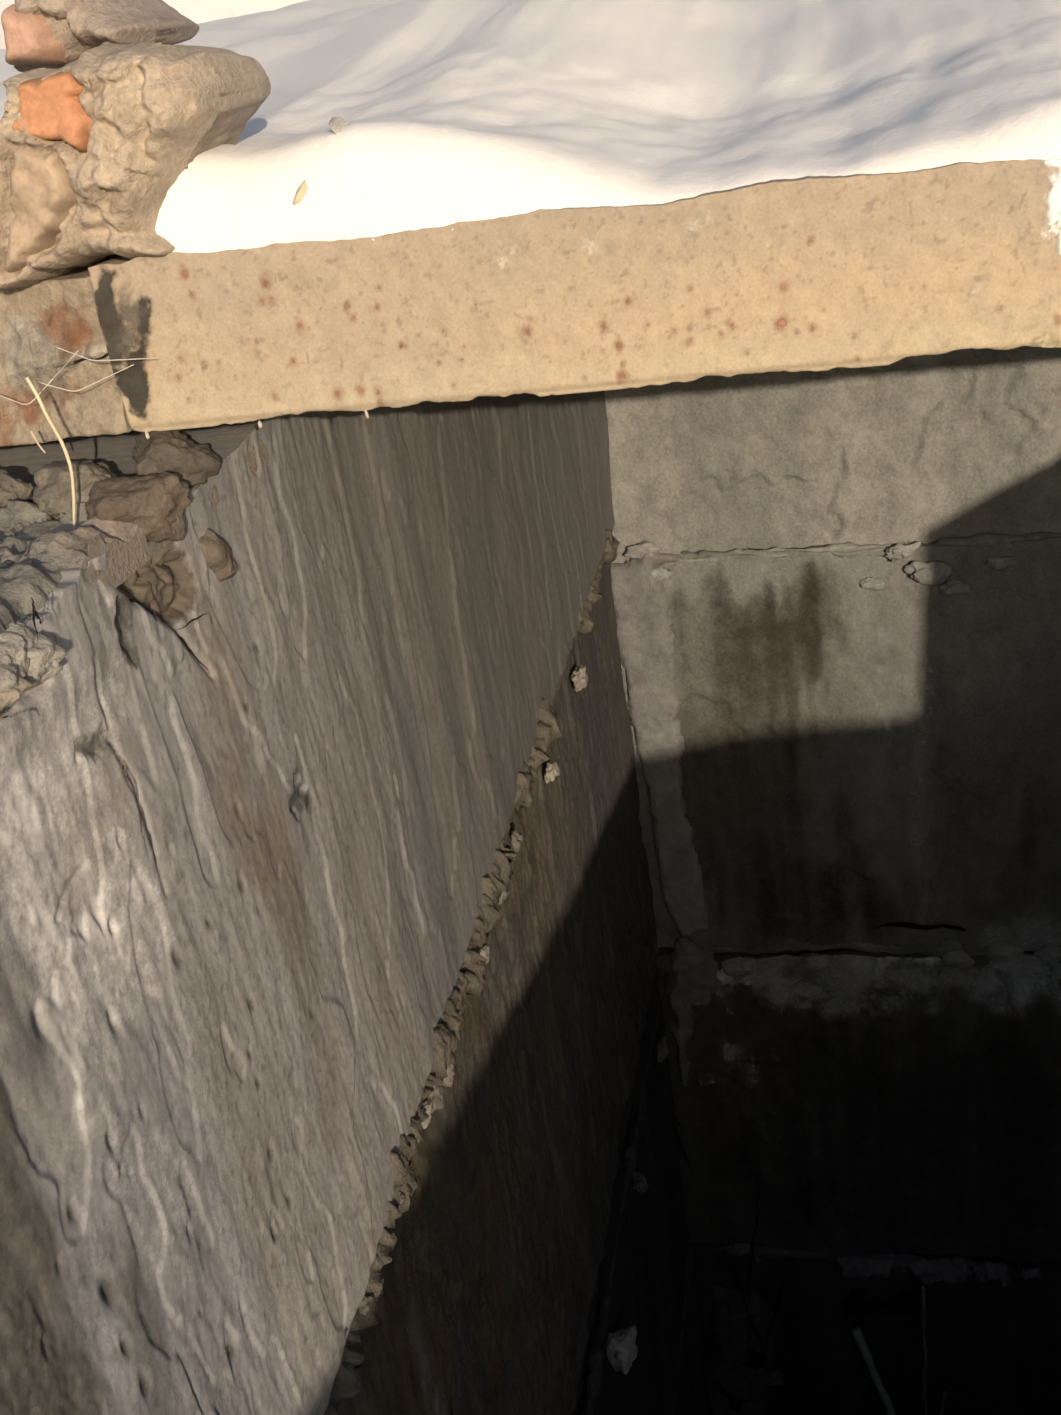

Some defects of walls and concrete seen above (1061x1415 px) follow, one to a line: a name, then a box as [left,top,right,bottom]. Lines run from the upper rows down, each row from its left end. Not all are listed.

spalling [114,528,238,669]
leakage [714,563,825,817]
crack [748,922,966,956]
leakage [717,833,1061,1015]